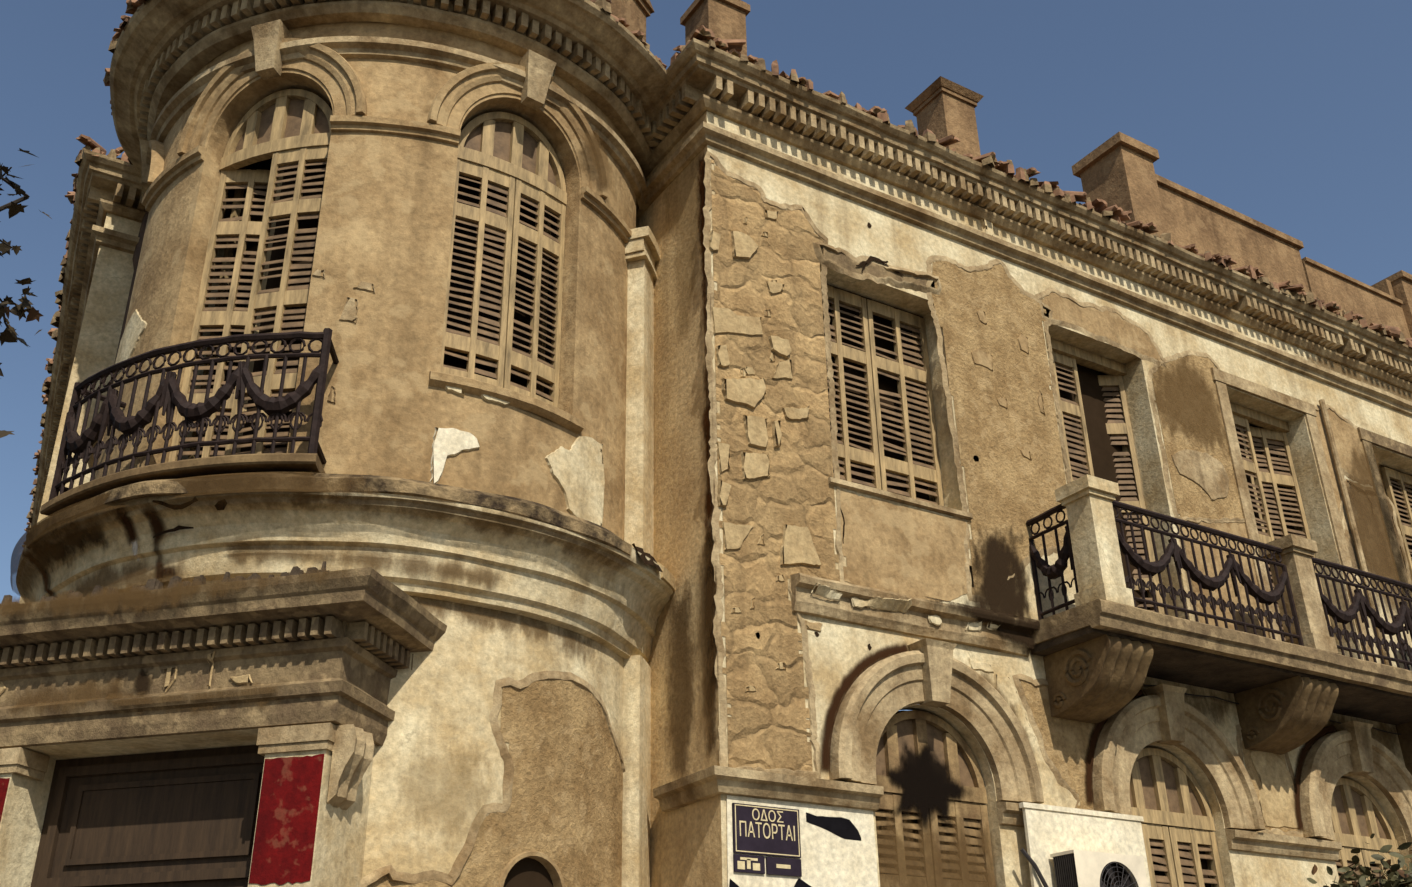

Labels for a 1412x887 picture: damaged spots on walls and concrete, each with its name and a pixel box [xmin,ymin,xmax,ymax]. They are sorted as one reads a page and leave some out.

flaking render [703,151,1269,779]
damp [1155,358,1225,448]
damp [0,472,634,614]
flaking render [360,671,625,887]
flaking render [1012,673,1095,810]